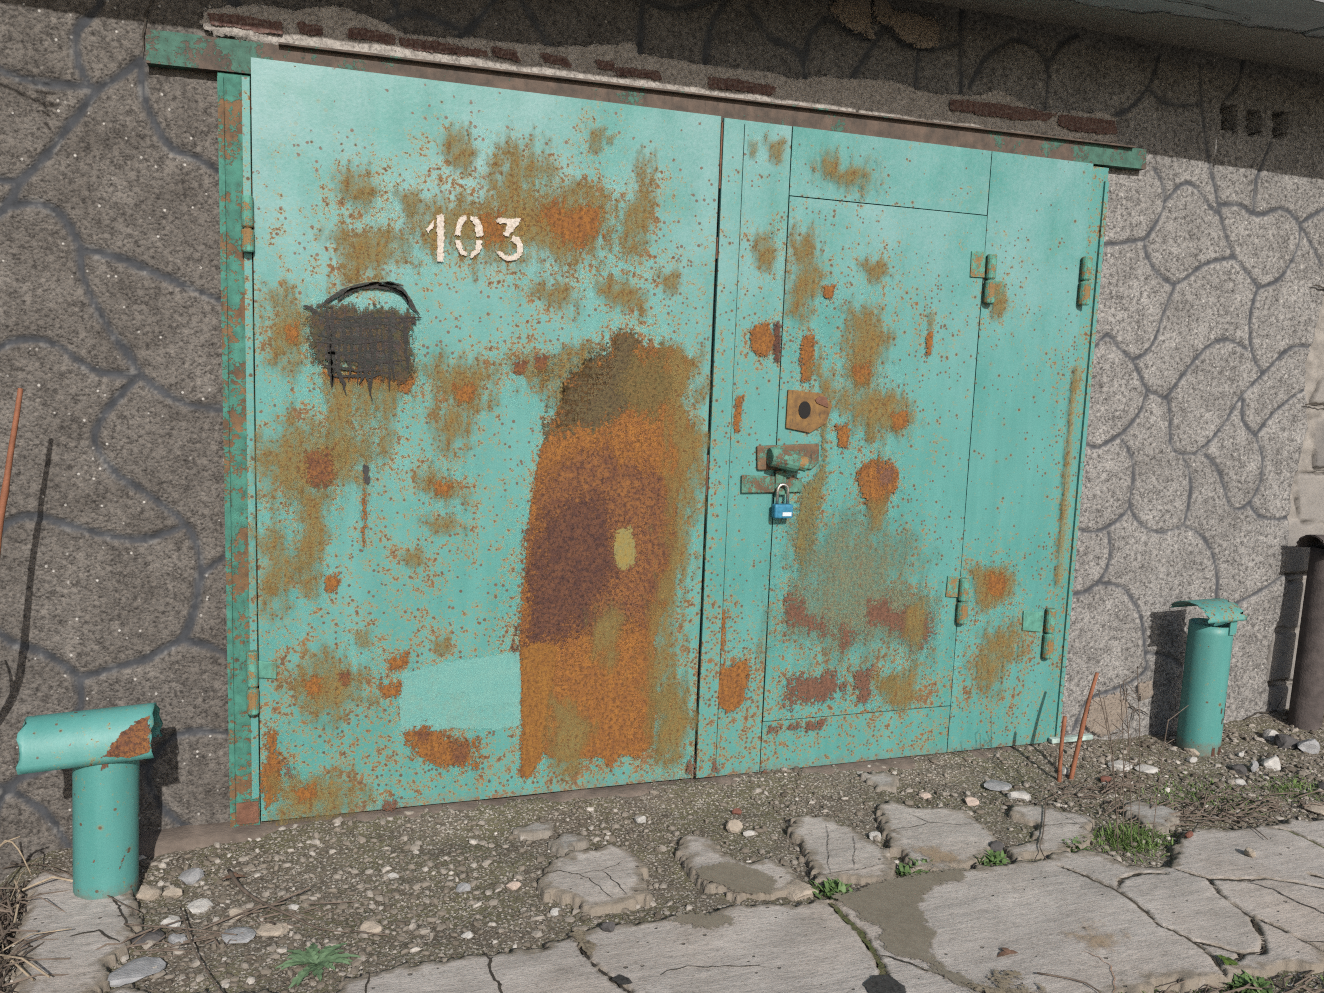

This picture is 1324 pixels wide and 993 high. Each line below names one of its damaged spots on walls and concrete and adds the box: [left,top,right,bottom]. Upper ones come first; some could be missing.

flaking render [200,0,1118,144]
rust [810,145,880,202]
rust [243,121,710,783]
rust [718,219,956,716]
rust [1056,365,1082,585]
rust [964,563,1034,697]
rust [101,716,152,758]
crack [485,952,503,993]
crack [579,942,631,993]
crack [660,965,760,975]
crack [791,826,944,976]
crack [1061,828,1324,976]